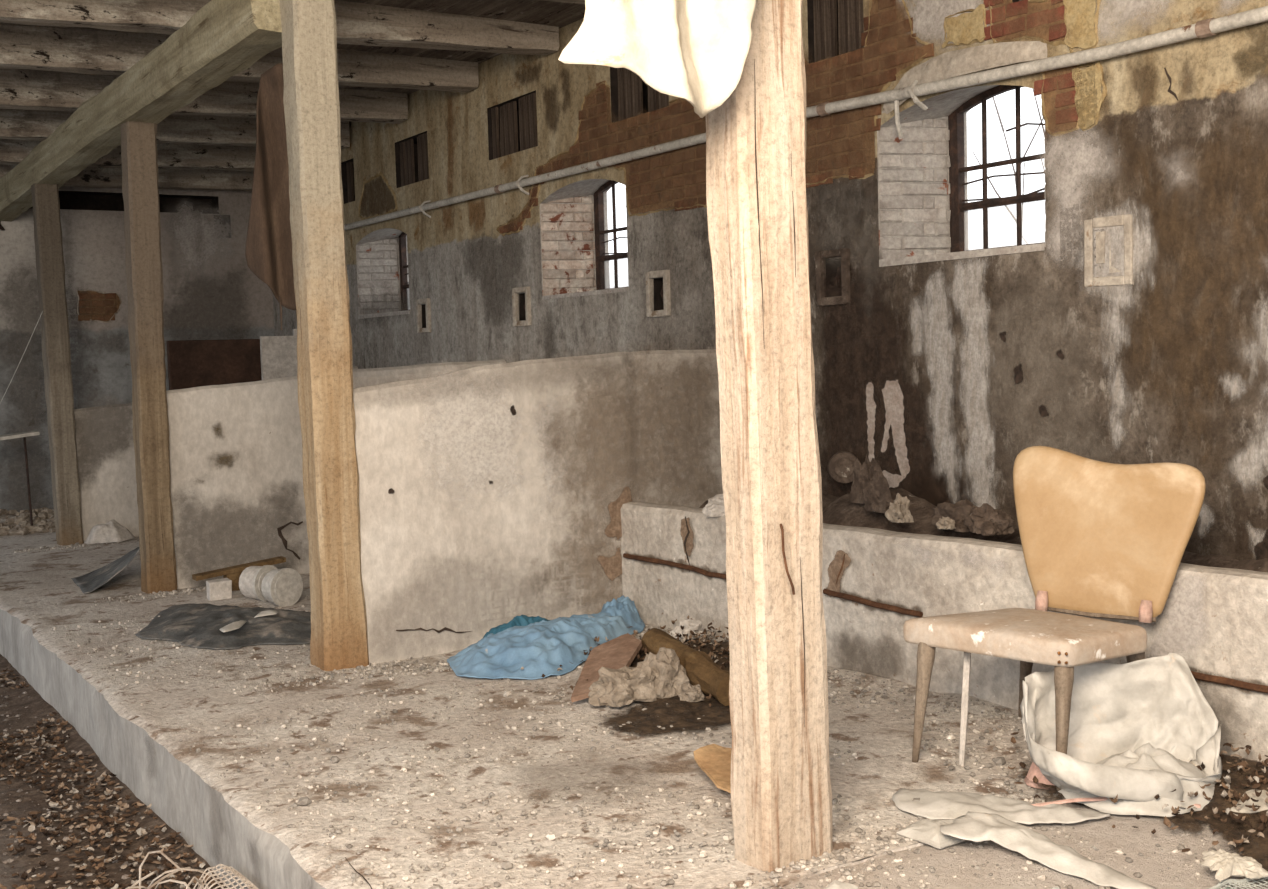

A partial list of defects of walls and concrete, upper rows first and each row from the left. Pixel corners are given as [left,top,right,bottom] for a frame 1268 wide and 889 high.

flaking render [804,0,1107,188]
flaking render [497,80,707,236]
flaking render [76,289,122,323]
damp [1047,133,1268,459]
damp [1233,418,1268,487]
crack [277,521,303,560]
crack [396,626,471,634]